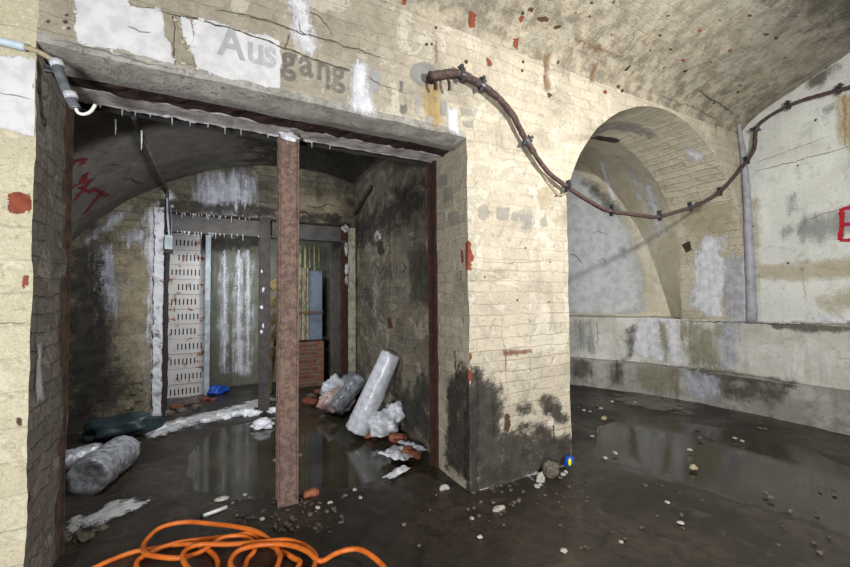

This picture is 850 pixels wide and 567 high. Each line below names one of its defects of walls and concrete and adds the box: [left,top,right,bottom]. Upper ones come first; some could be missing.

peeling [63,0,282,90]
crack [49,1,402,92]
peeling [0,55,36,137]
spalling [4,192,31,214]
water stain [193,168,256,216]
spalling [461,240,474,270]
water stain [94,192,174,415]
water stain [218,250,254,374]
water stain [574,360,592,377]
water stain [612,250,795,402]